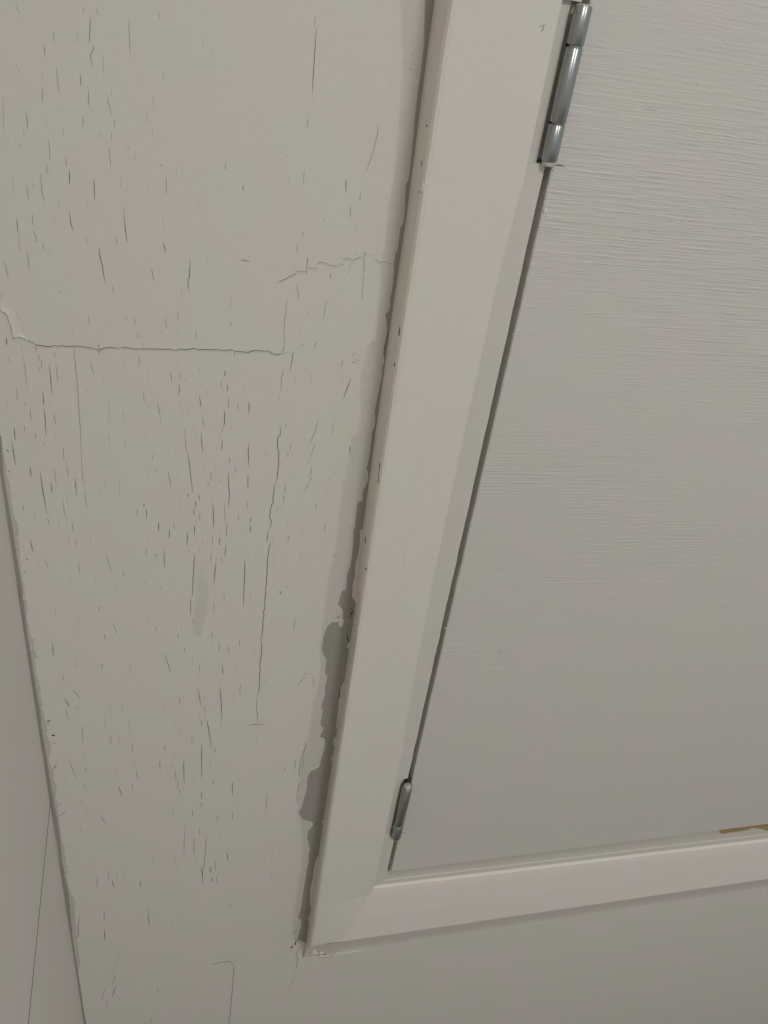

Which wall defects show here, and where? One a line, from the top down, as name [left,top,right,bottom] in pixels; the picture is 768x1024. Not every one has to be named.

crack [0,8,394,884]
peeling [292,0,434,944]